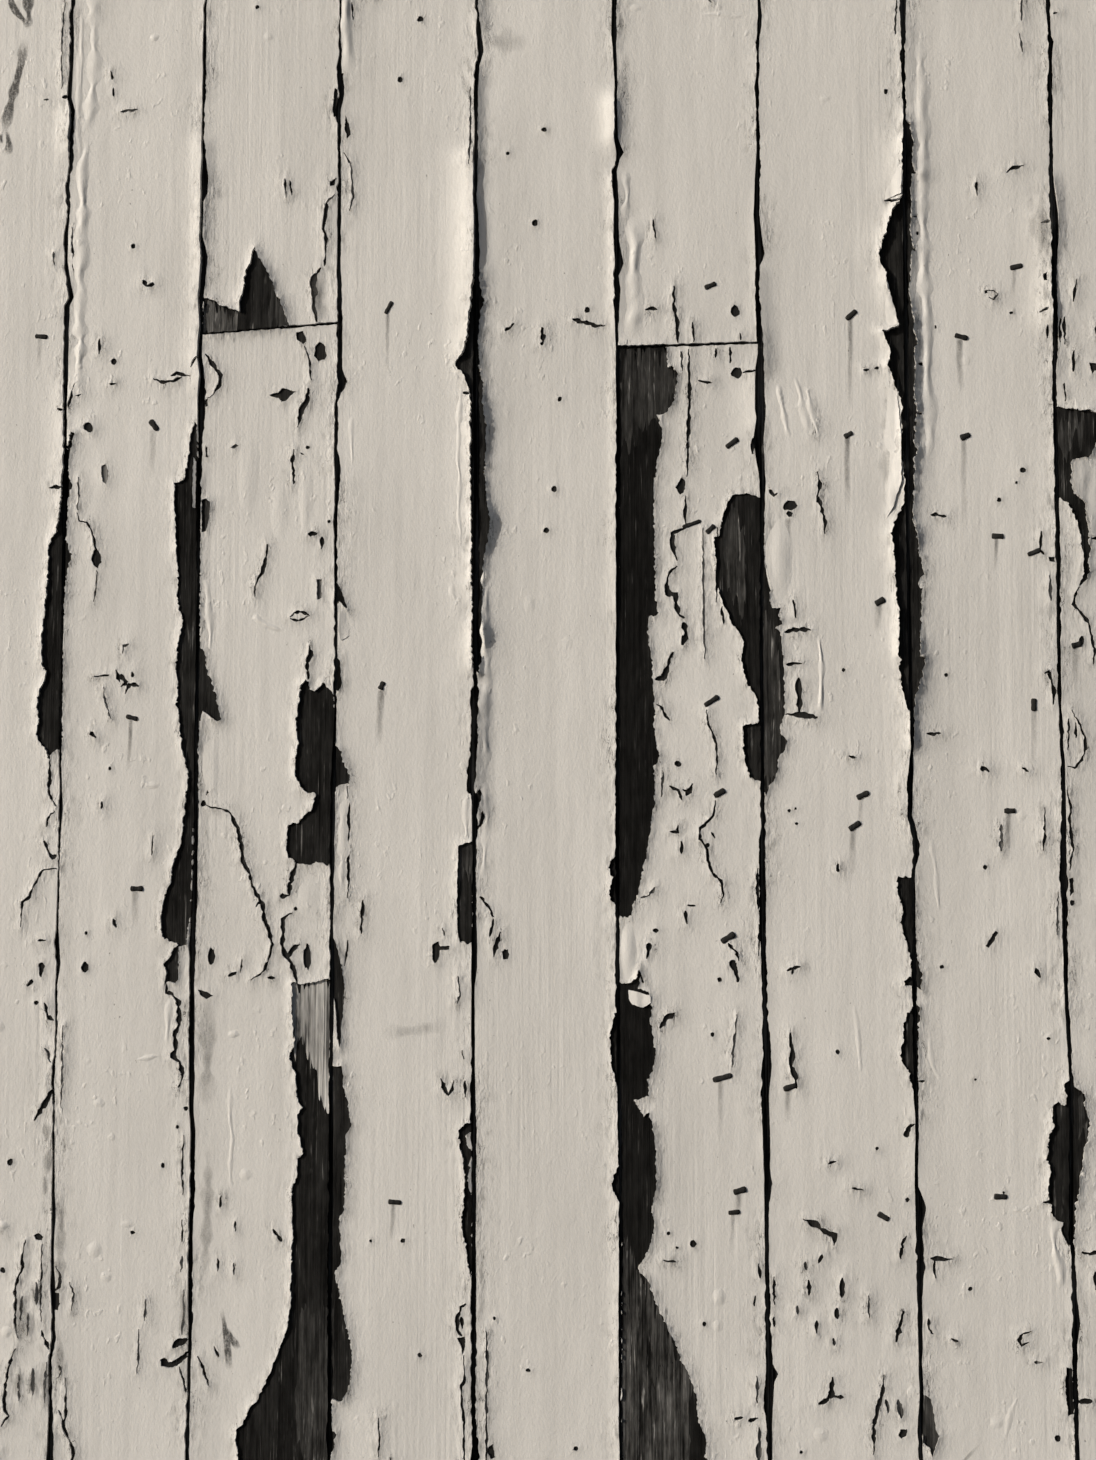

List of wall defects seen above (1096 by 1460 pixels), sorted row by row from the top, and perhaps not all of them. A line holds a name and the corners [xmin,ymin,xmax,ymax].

peeling [36,432,75,759]
peeling [161,423,221,984]
crack [206,790,300,983]
peeling [203,249,306,344]
peeling [286,659,350,866]
peeling [609,347,681,917]
peeling [714,493,787,794]
peeling [879,121,925,737]
peeling [1056,407,1096,575]
peeling [236,940,352,1460]
peeling [609,970,708,1460]
peeling [1043,1081,1090,1246]